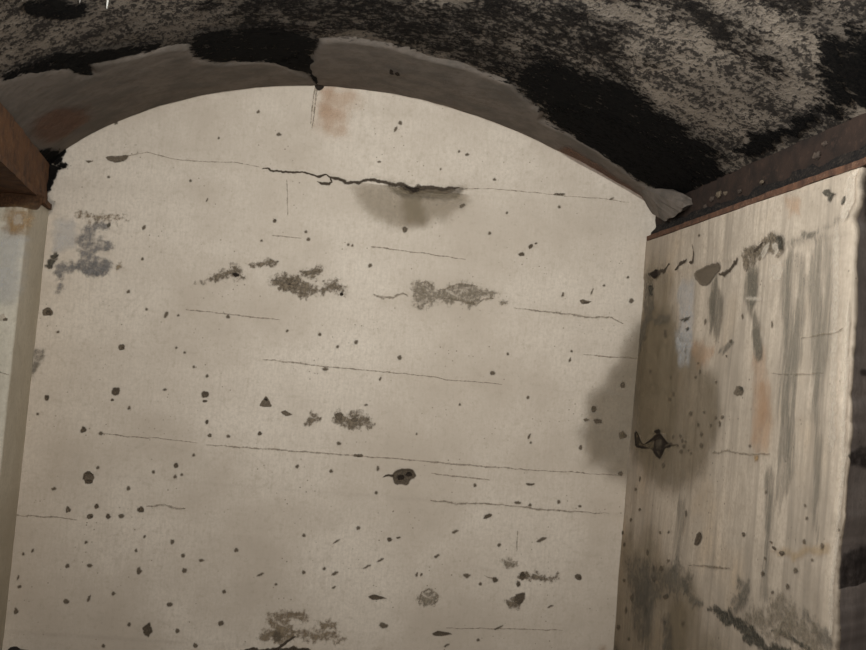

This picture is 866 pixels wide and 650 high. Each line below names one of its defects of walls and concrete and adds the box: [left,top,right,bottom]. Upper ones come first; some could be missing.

crack [235,162,552,195]
leakage [394,187,462,198]
leakage [45,211,122,290]
crack [245,636,310,650]
leakage [260,612,346,643]